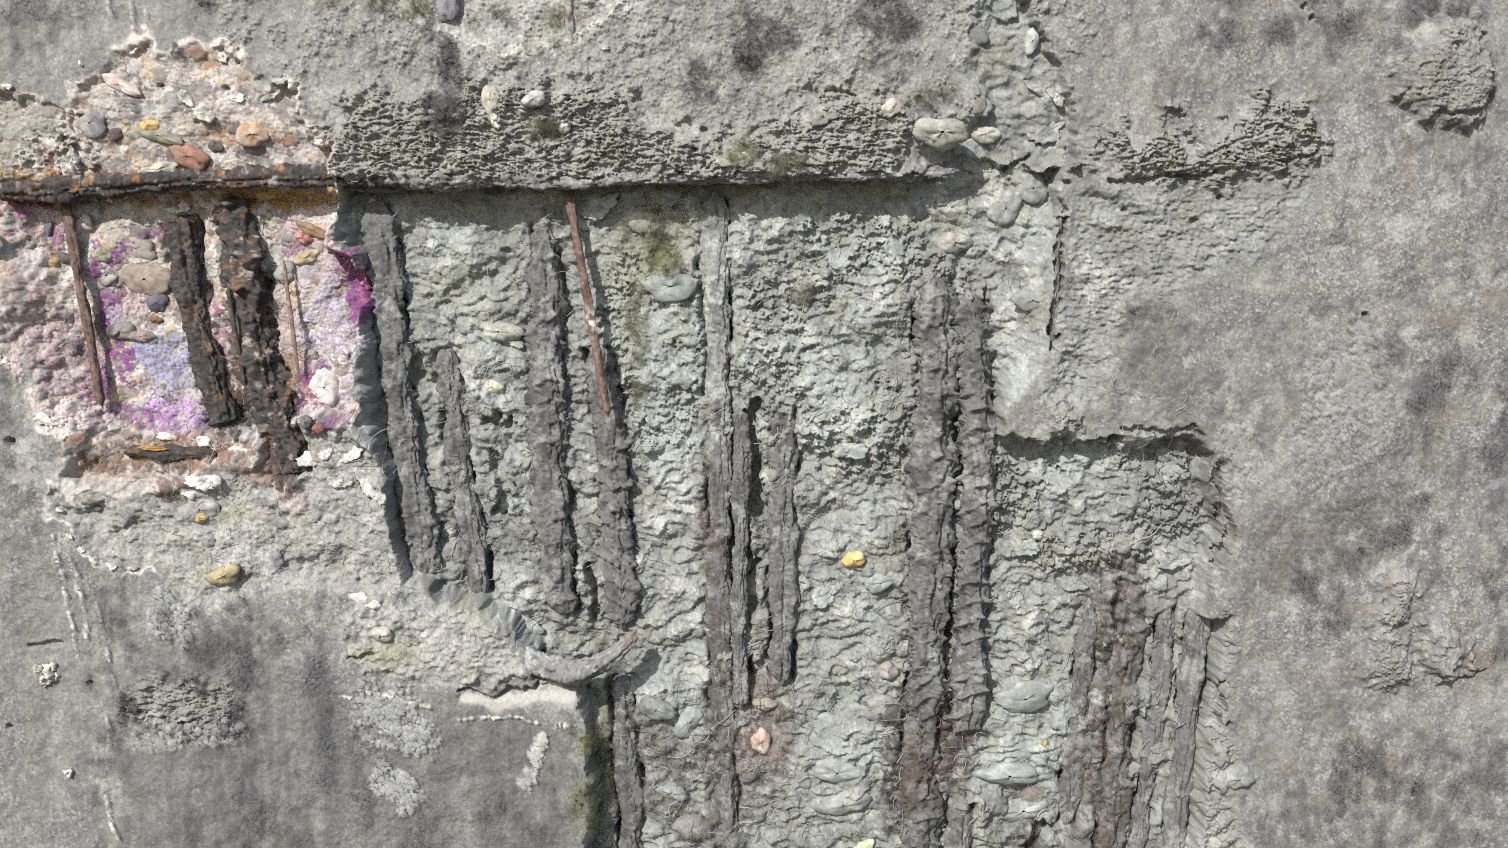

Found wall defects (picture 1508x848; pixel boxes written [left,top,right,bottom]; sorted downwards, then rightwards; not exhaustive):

corrosion [44,173,490,594]
spalling [0,30,937,546]
spalling [394,0,650,60]
corrosion [522,226,643,628]
spalling [44,154,1326,848]
corrosion [879,273,1001,848]
crack [1002,154,1219,352]
spalling [911,0,1331,188]
corrosion [1058,579,1212,848]